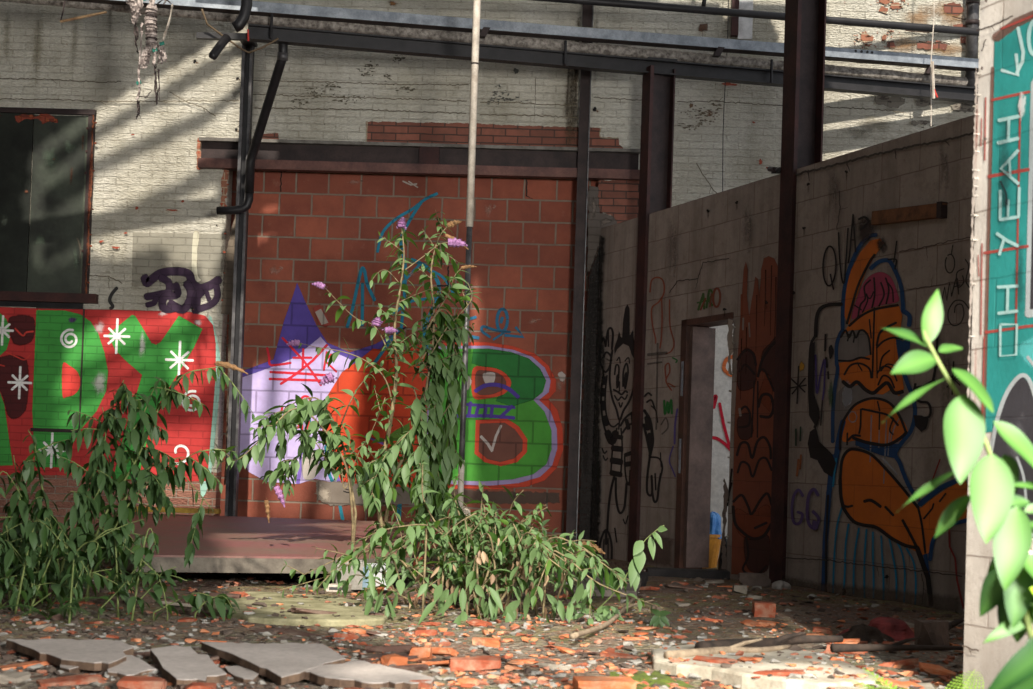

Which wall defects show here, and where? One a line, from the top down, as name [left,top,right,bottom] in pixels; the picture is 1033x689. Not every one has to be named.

peeling [853,0,966,52]
peeling [678,100,723,130]